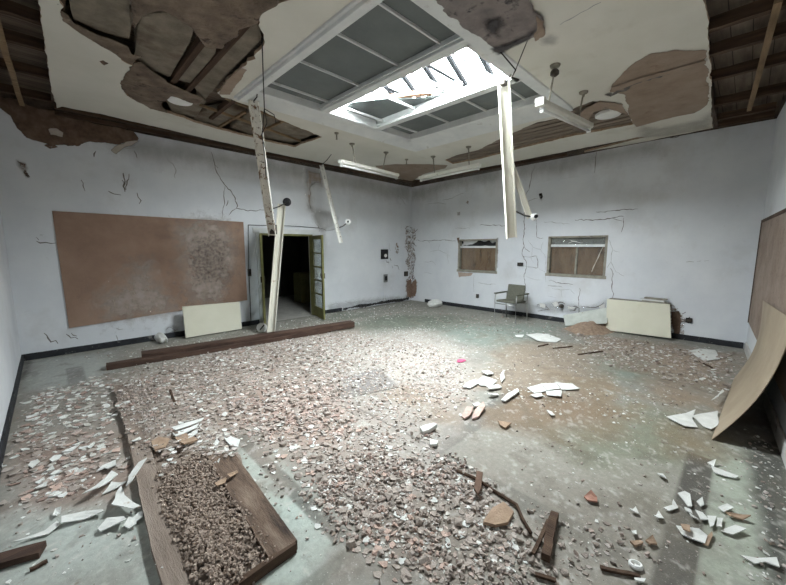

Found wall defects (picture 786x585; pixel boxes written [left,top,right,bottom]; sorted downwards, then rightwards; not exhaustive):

peeling [130,0,280,49]
peeling [436,0,545,55]
peeling [60,11,203,113]
peeling [219,68,246,95]
peeling [577,50,709,127]
crack [108,173,142,204]
crack [211,152,259,217]
flaking render [386,226,418,298]
crack [522,167,634,305]